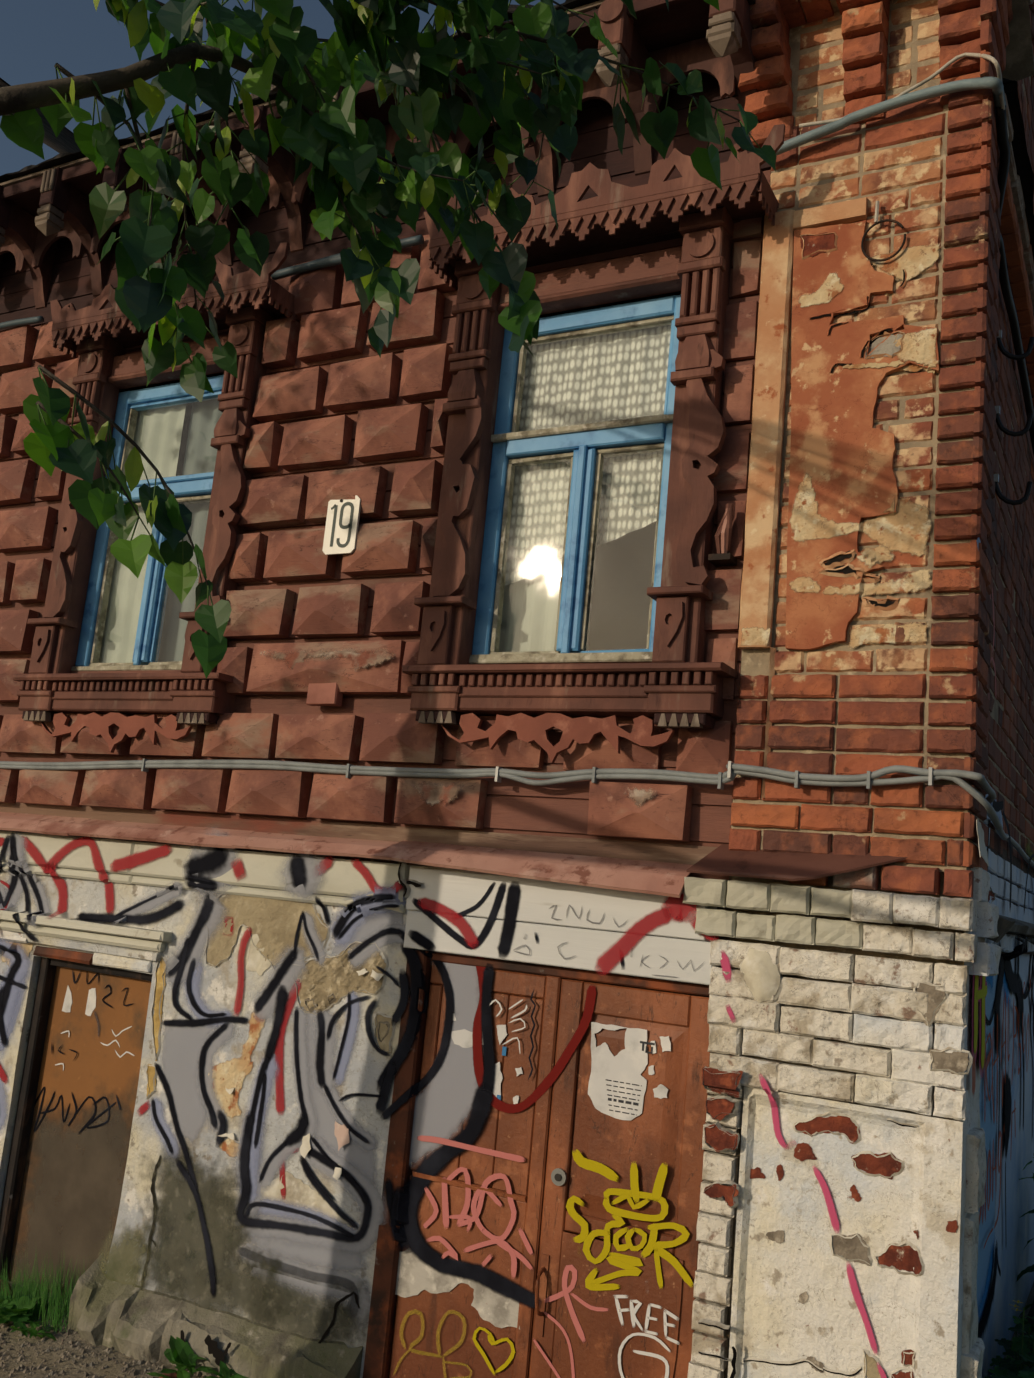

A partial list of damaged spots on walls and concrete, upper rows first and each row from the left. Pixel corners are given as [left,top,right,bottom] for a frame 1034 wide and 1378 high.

peeling [867,244,940,281]
peeling [835,328,940,373]
peeling [789,474,932,648]
flaking render [205,889,389,1015]
peeling [208,1011,265,1157]
spalling [702,1066,744,1152]
spalling [703,1111,905,1208]
peeling [766,1230,784,1244]
spalling [829,1230,925,1277]
peeling [946,1220,958,1233]
peeling [803,1355,824,1373]
flaking render [862,1349,916,1378]